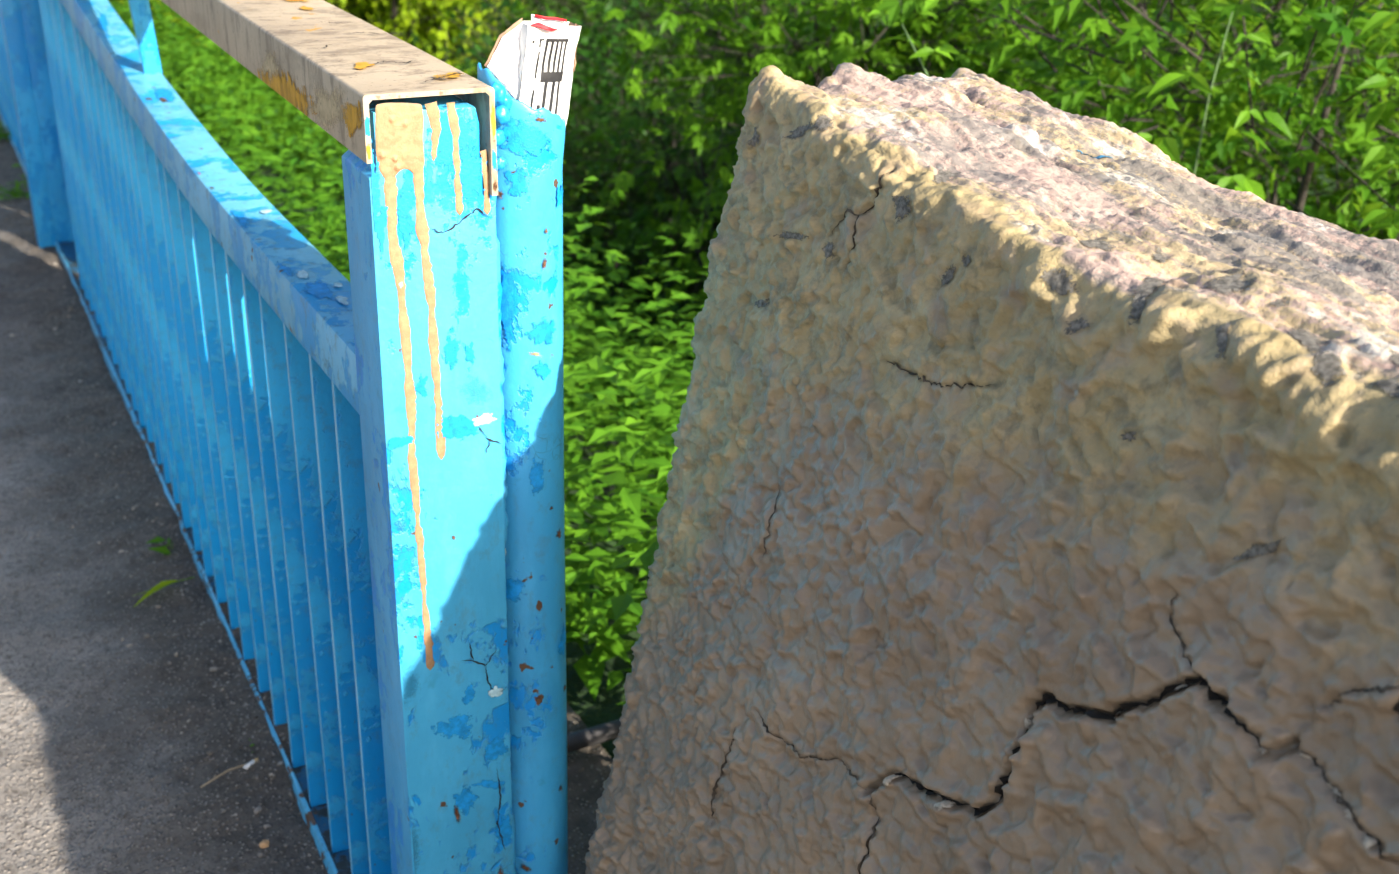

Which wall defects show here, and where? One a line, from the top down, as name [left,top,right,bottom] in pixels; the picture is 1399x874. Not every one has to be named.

peeling [154,87,175,102]
peeling [257,52,317,116]
peeling [342,100,415,259]
peeling [231,209,272,228]
peeling [444,335,476,370]
peeling [415,373,428,397]
peeling [388,436,414,450]
peeling [437,413,497,441]
peeling [506,578,525,602]
peeling [431,684,503,739]
crack [710,595,1399,874]
peeling [453,780,505,816]